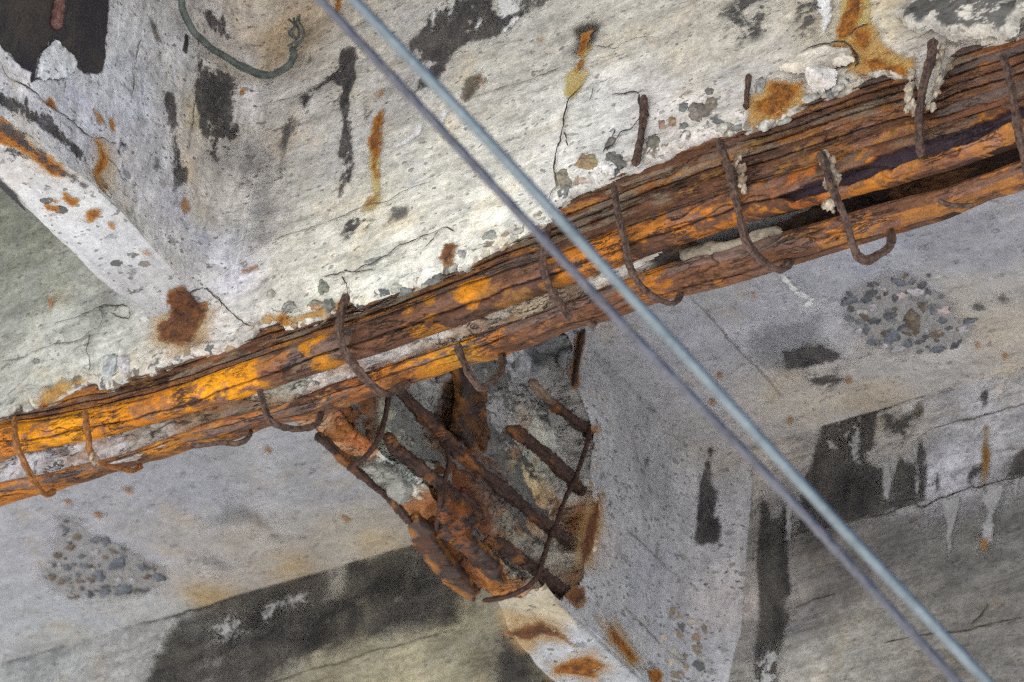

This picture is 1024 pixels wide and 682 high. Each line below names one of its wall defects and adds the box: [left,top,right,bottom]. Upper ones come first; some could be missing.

peeling [0,0,109,83]
damp [408,0,546,89]
rust [830,0,914,77]
damp [300,46,371,197]
rust [748,80,805,126]
spalling [389,71,911,297]
crack [325,227,454,294]
rust [157,285,208,346]
crack [172,286,253,326]
spalling [0,240,702,482]
spalling [295,335,601,601]
damp [754,405,960,682]